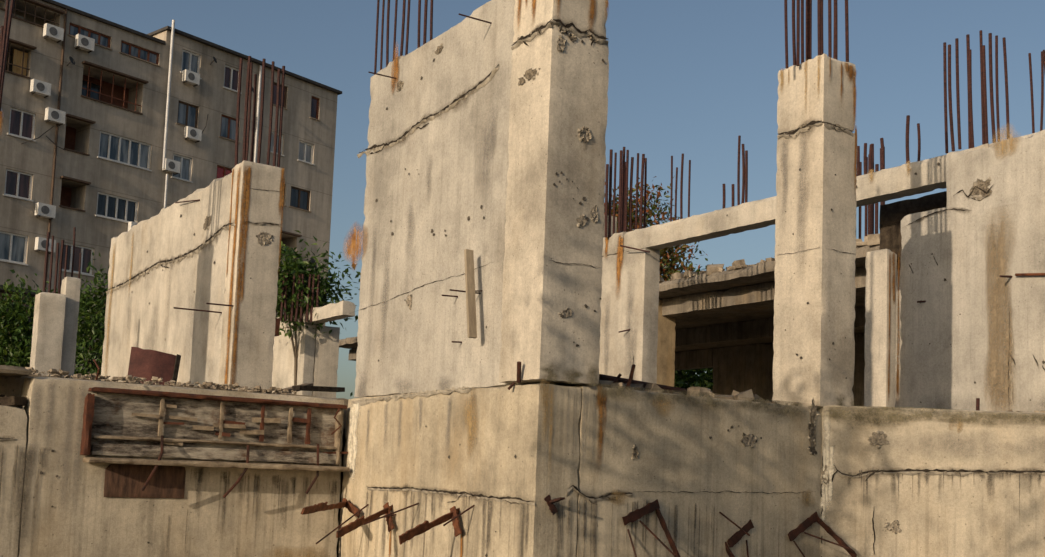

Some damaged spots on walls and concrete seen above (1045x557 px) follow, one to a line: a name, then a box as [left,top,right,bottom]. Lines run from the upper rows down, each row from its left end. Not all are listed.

rust [589,0,608,26]
crack [357,19,608,158]
crack [777,120,854,139]
rust [805,57,857,188]
rust [224,167,251,389]
rust [597,386,607,453]
crack [339,485,535,557]
crack [567,456,1045,557]